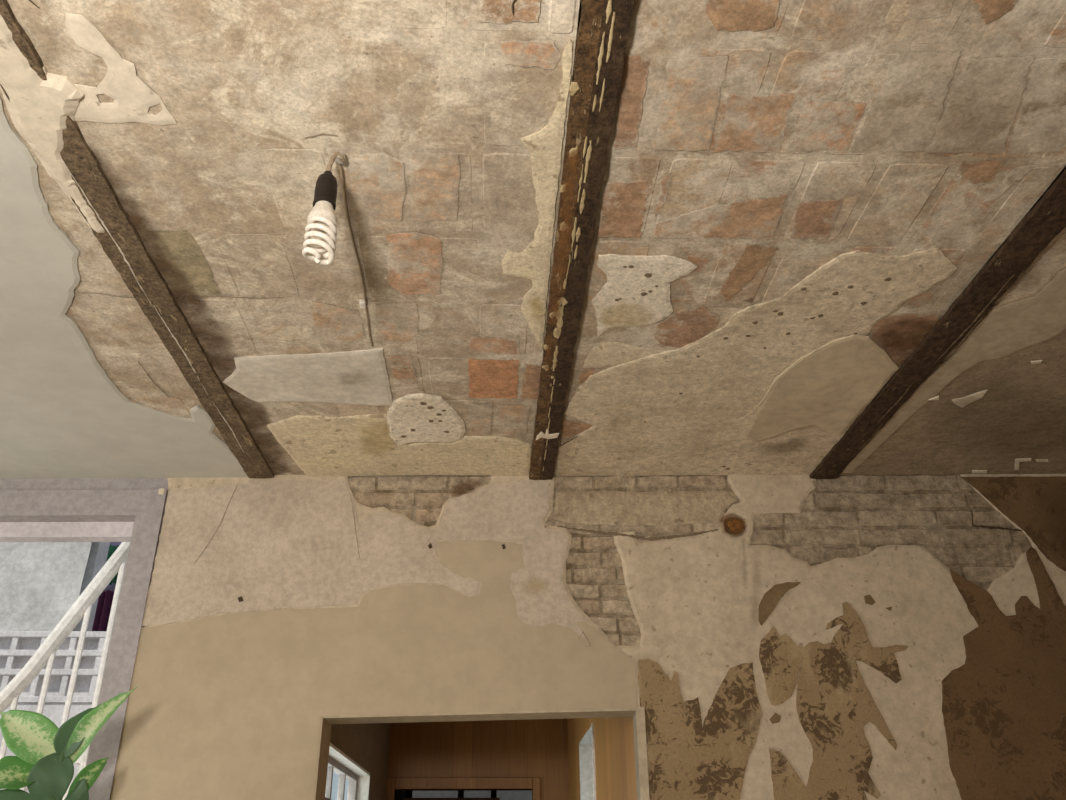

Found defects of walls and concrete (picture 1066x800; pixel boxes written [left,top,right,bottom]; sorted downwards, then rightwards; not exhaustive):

flaking render [0,0,580,479]
flaking render [565,0,1066,409]
crack [194,486,237,564]
peeling [110,217,1066,800]